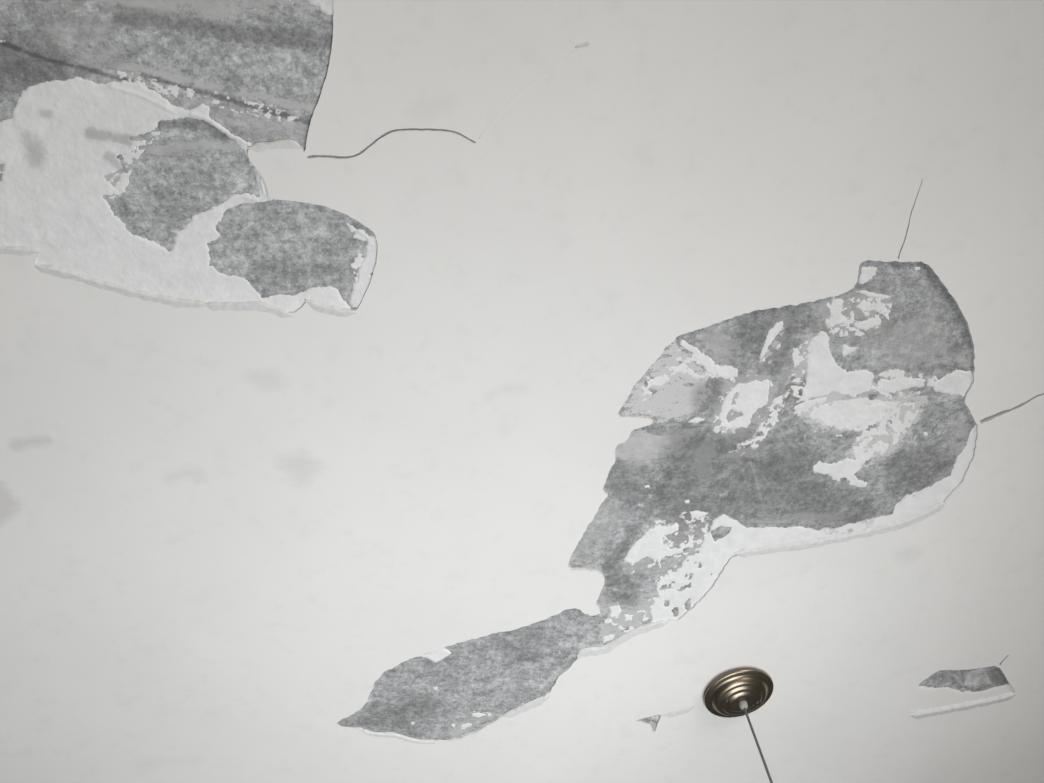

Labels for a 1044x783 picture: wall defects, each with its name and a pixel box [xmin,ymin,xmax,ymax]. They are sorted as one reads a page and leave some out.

peeling [0,0,378,318]
crack [307,41,590,159]
crack [898,179,923,259]
crack [980,393,1044,424]
peeling [336,260,978,744]
peeling [909,666,1017,719]